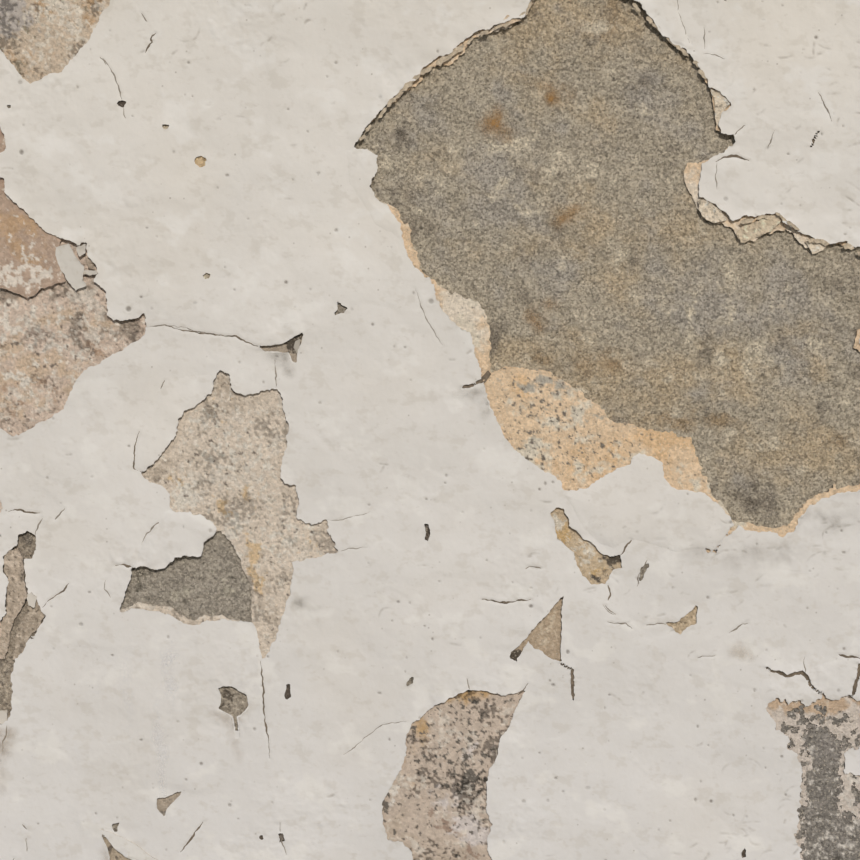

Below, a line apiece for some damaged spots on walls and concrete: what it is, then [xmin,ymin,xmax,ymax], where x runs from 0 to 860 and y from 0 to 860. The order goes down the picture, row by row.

peeling [0,0,110,84]
peeling [0,177,146,436]
crack [153,324,256,346]
peeling [354,0,860,537]
peeling [0,531,45,725]
peeling [120,370,338,658]
peeling [510,597,563,661]
peeling [550,507,622,584]
crack [766,657,819,692]
crack [839,654,860,698]
peeling [382,690,525,860]
peeling [766,694,860,860]